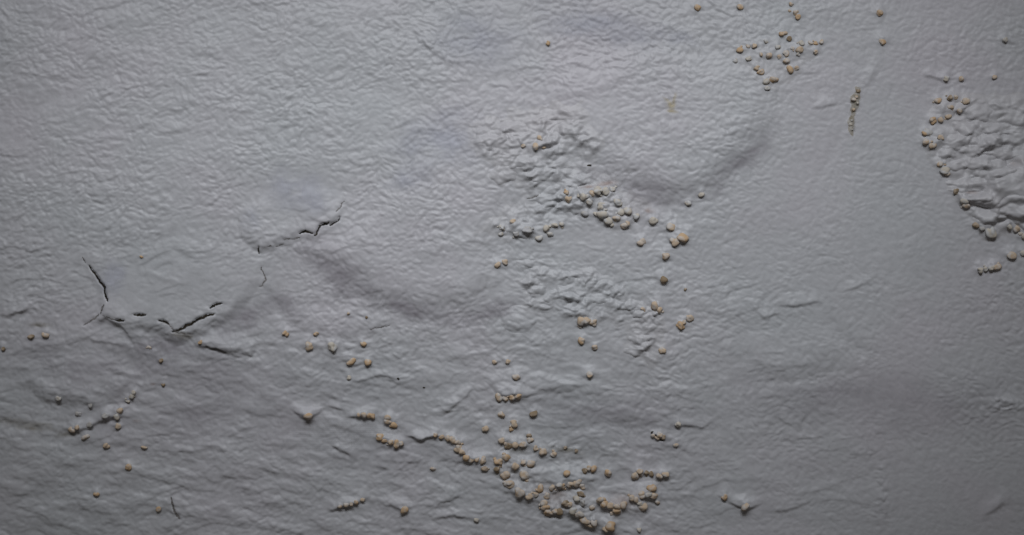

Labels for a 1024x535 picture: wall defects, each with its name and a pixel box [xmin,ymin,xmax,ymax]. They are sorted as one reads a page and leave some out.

crack [258,201,345,287]
crack [82,257,221,334]